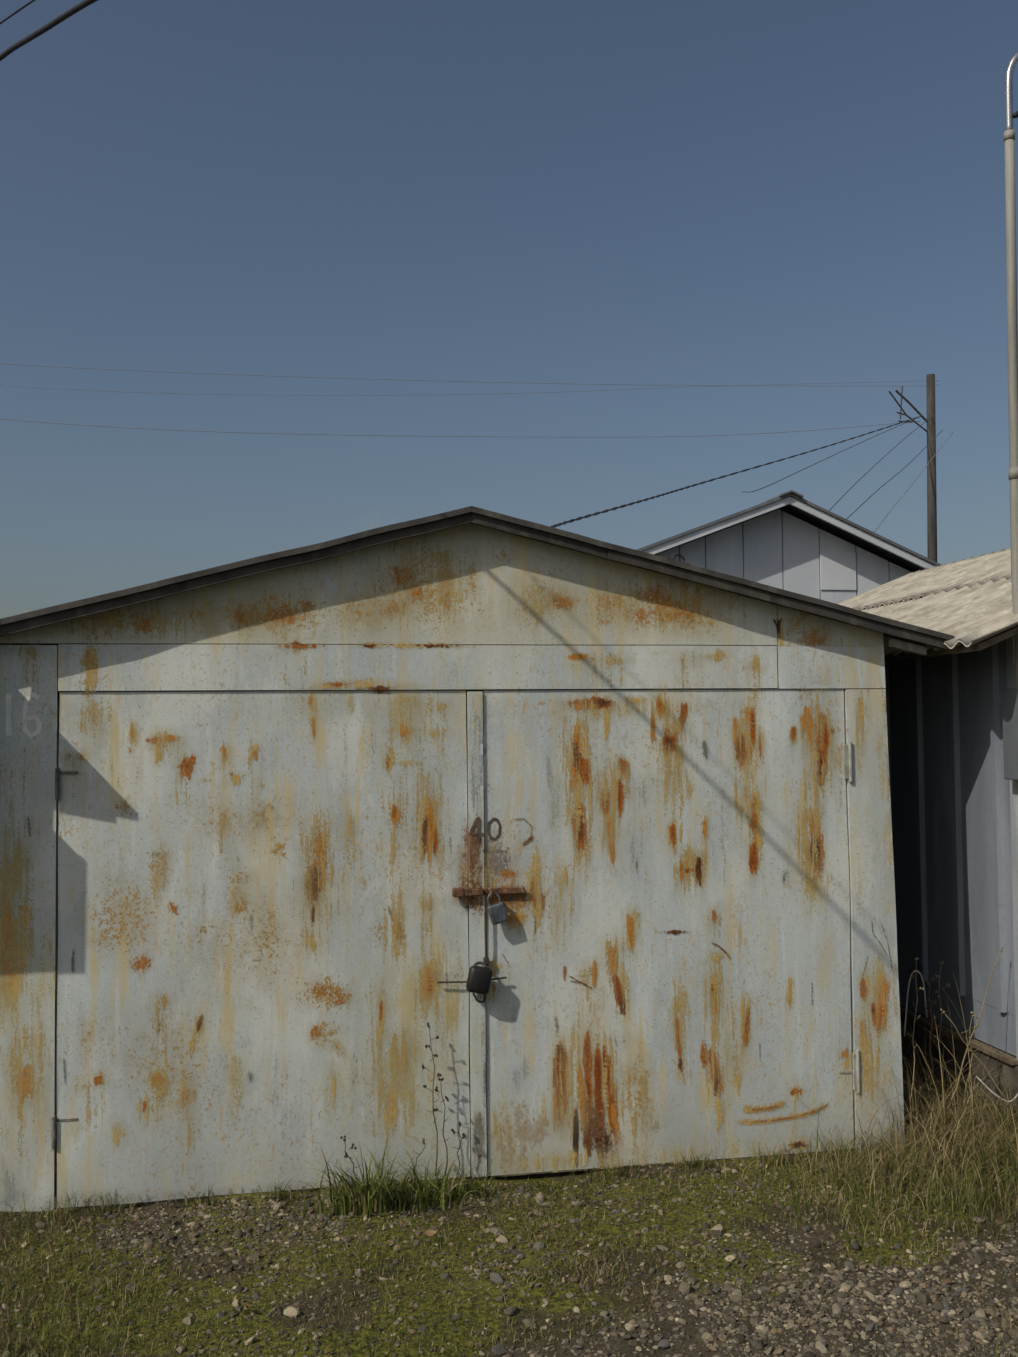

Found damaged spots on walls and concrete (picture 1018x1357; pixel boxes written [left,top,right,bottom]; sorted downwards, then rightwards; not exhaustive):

rust [0,764,45,1156]
rust [129,640,726,1174]
rust [672,952,828,1132]
rust [789,687,889,910]
rust [841,957,896,1100]